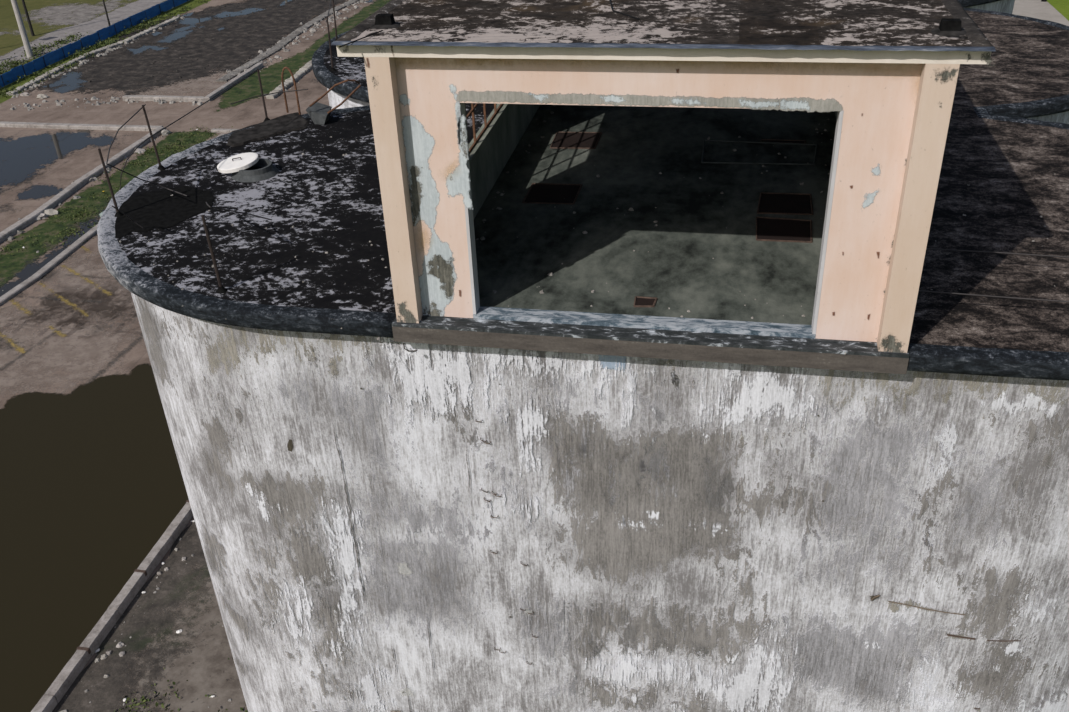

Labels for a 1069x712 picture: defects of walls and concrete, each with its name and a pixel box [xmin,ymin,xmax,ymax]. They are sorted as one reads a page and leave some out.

peeling [399,84,843,317]
crack [334,433,364,596]